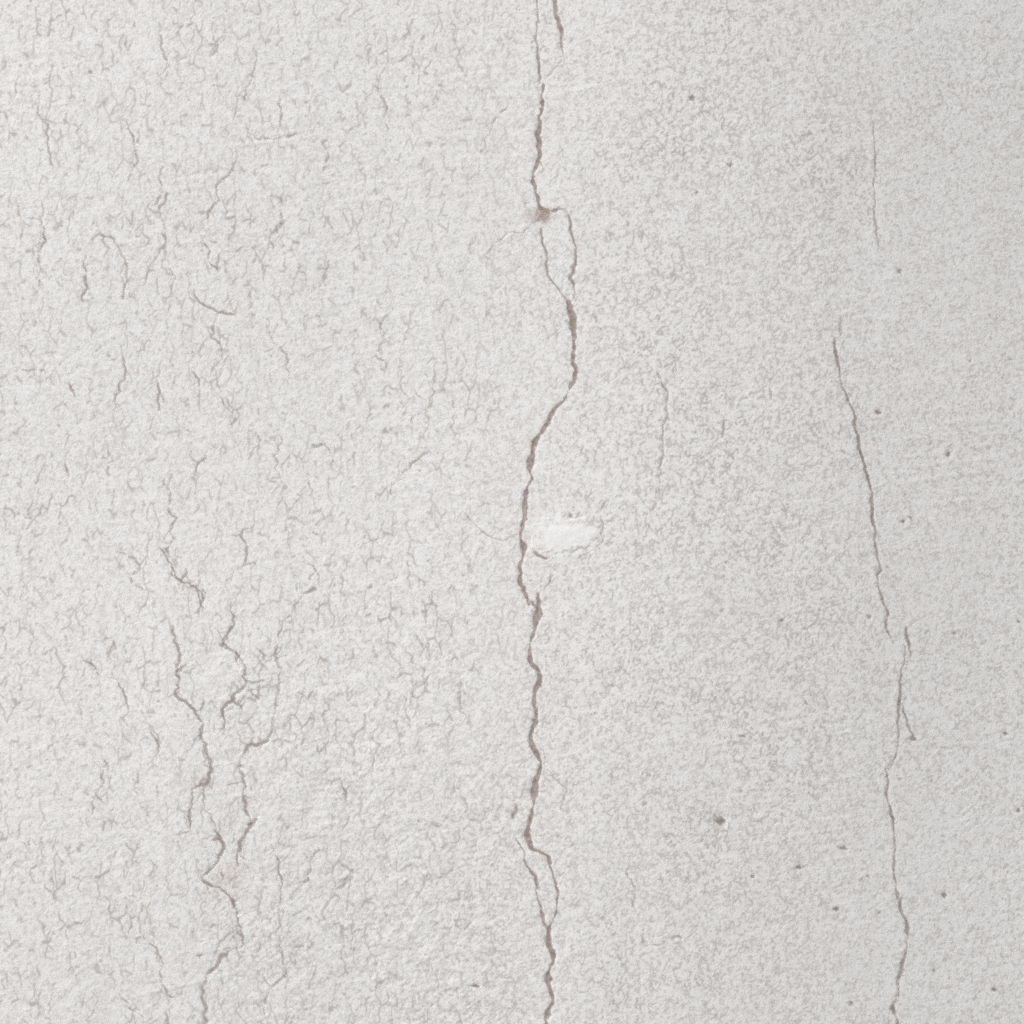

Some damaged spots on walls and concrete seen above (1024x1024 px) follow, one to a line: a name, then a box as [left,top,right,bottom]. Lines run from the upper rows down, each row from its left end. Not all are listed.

crack [537,0,563,38]
crack [511,50,577,1024]
crack [833,339,911,646]
crack [171,615,257,974]
crack [244,736,269,753]
crack [885,782,909,1024]
crack [897,674,910,728]